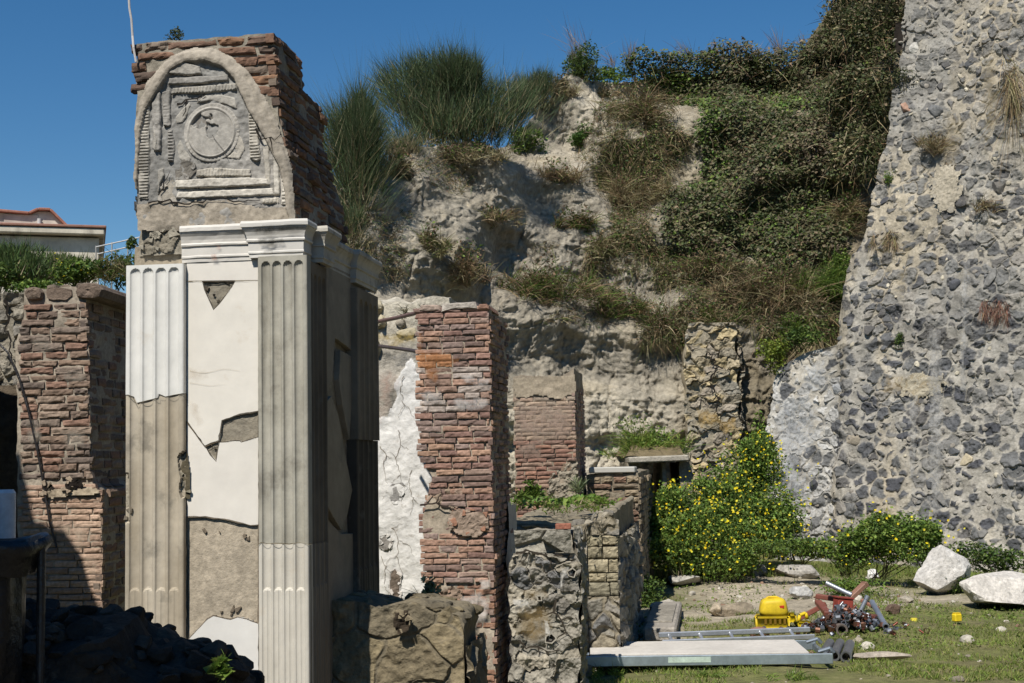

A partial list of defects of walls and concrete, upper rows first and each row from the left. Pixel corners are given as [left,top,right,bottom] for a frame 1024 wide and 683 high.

peeling [202,280,235,310]
peeling [206,411,259,460]
spalling [123,474,133,524]
spalling [180,450,192,499]
crack [380,376,480,593]
peeling [186,516,259,639]